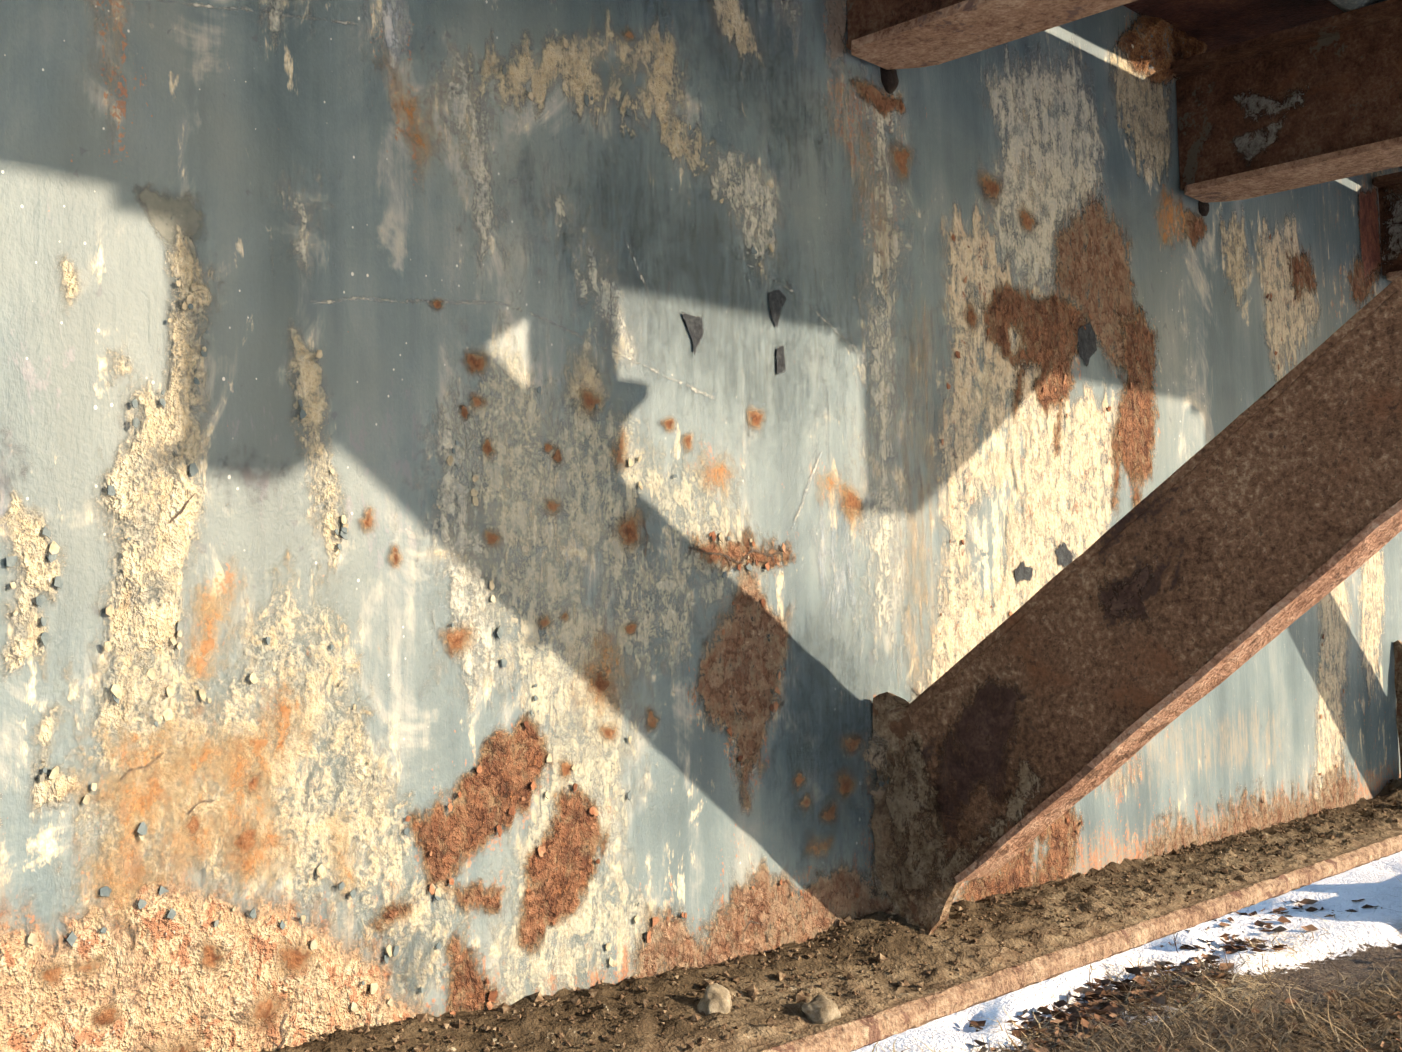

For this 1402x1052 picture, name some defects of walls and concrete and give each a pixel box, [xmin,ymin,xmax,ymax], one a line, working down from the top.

peeling [429,10,783,268]
peeling [708,0,762,62]
corrosion [1116,13,1207,85]
peeling [777,346,785,374]
corrosion [965,189,1160,510]
peeling [0,492,64,678]
peeling [31,225,467,1014]
peeling [417,189,772,1008]
corrosion [692,526,796,812]
corrosion [0,682,431,1052]
corrosion [446,932,499,1015]
corrosion [405,715,609,954]